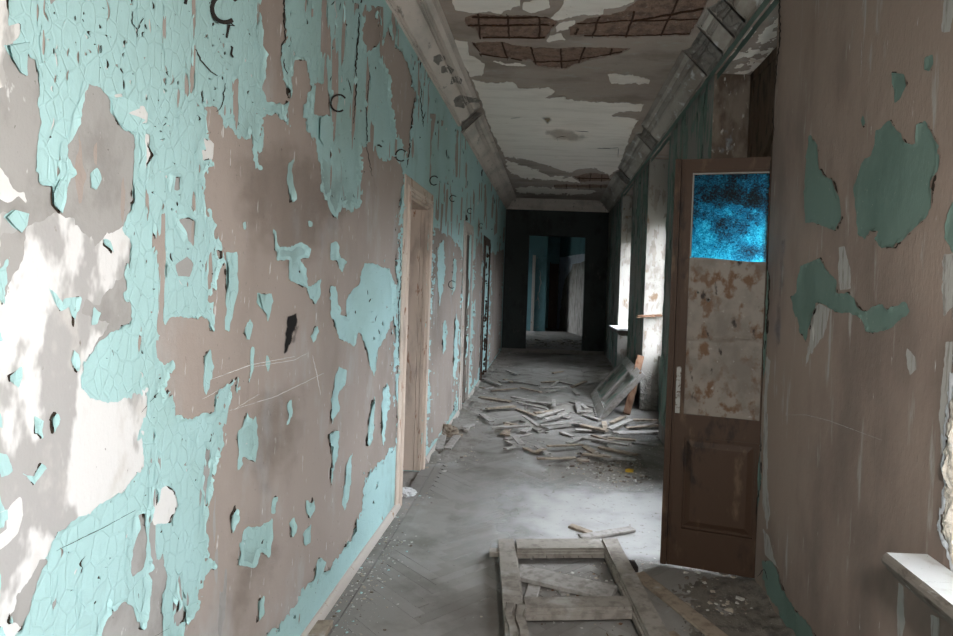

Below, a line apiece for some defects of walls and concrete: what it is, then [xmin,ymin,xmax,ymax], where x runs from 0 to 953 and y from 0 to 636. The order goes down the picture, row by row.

peeling [452,0,707,195]
peeling [726,17,778,74]
peeling [803,135,843,231]
peeling [853,120,941,248]
peeling [0,0,505,636]
peeling [790,257,909,341]
spalling [937,372,953,572]
peeling [762,561,816,636]